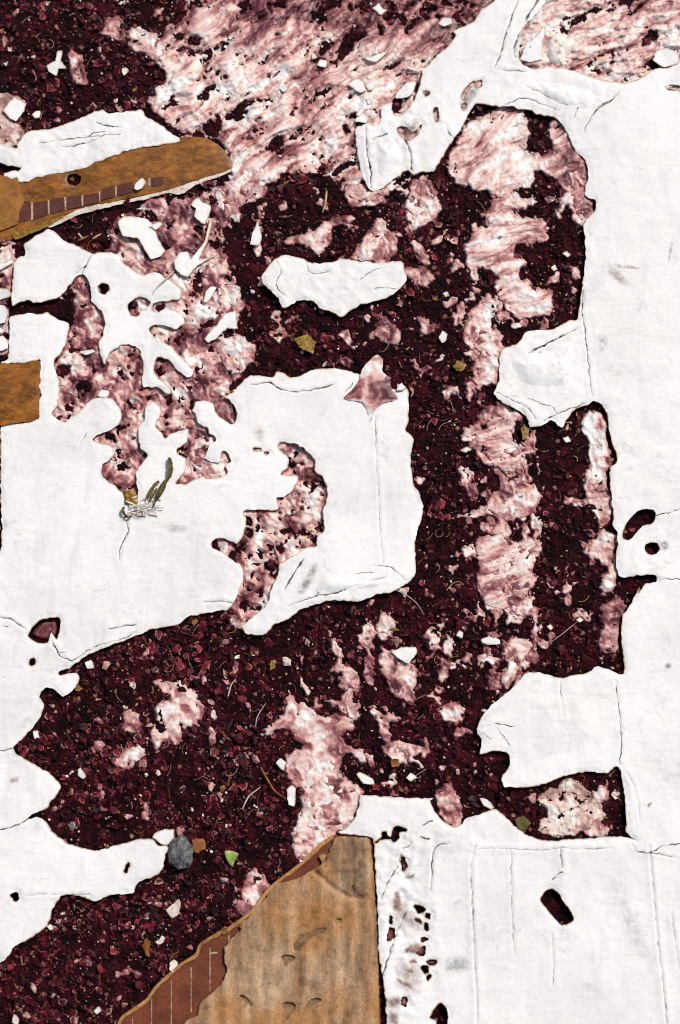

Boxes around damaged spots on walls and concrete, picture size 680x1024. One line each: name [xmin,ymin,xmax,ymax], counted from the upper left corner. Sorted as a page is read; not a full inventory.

peeling [0,0,494,206]
peeling [569,168,587,190]
peeling [250,222,262,246]
peeling [0,176,249,495]
peeling [211,442,328,631]
peeling [481,637,500,645]
peeling [392,646,417,663]
peeling [316,758,338,793]
peeling [356,772,374,784]
peeling [287,785,296,806]
peeling [153,828,175,846]
peeling [371,838,387,1024]